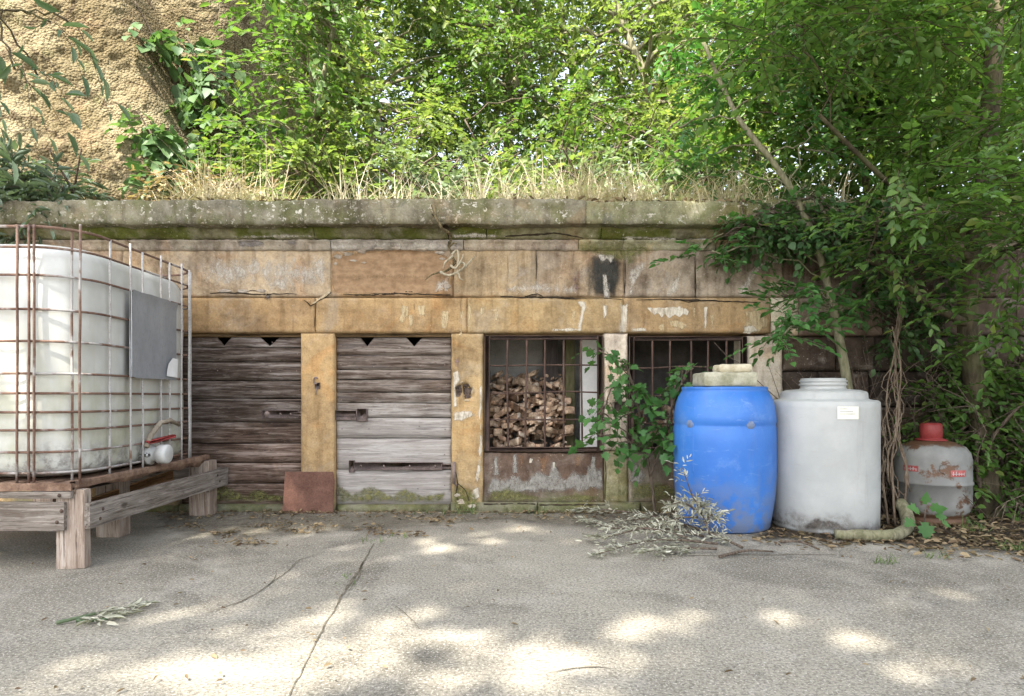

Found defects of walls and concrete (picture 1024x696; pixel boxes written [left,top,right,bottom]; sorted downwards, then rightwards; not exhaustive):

leakage [588,255,643,317]
crack [210,289,462,331]
leakage [620,305,645,332]
peeling [648,306,688,331]